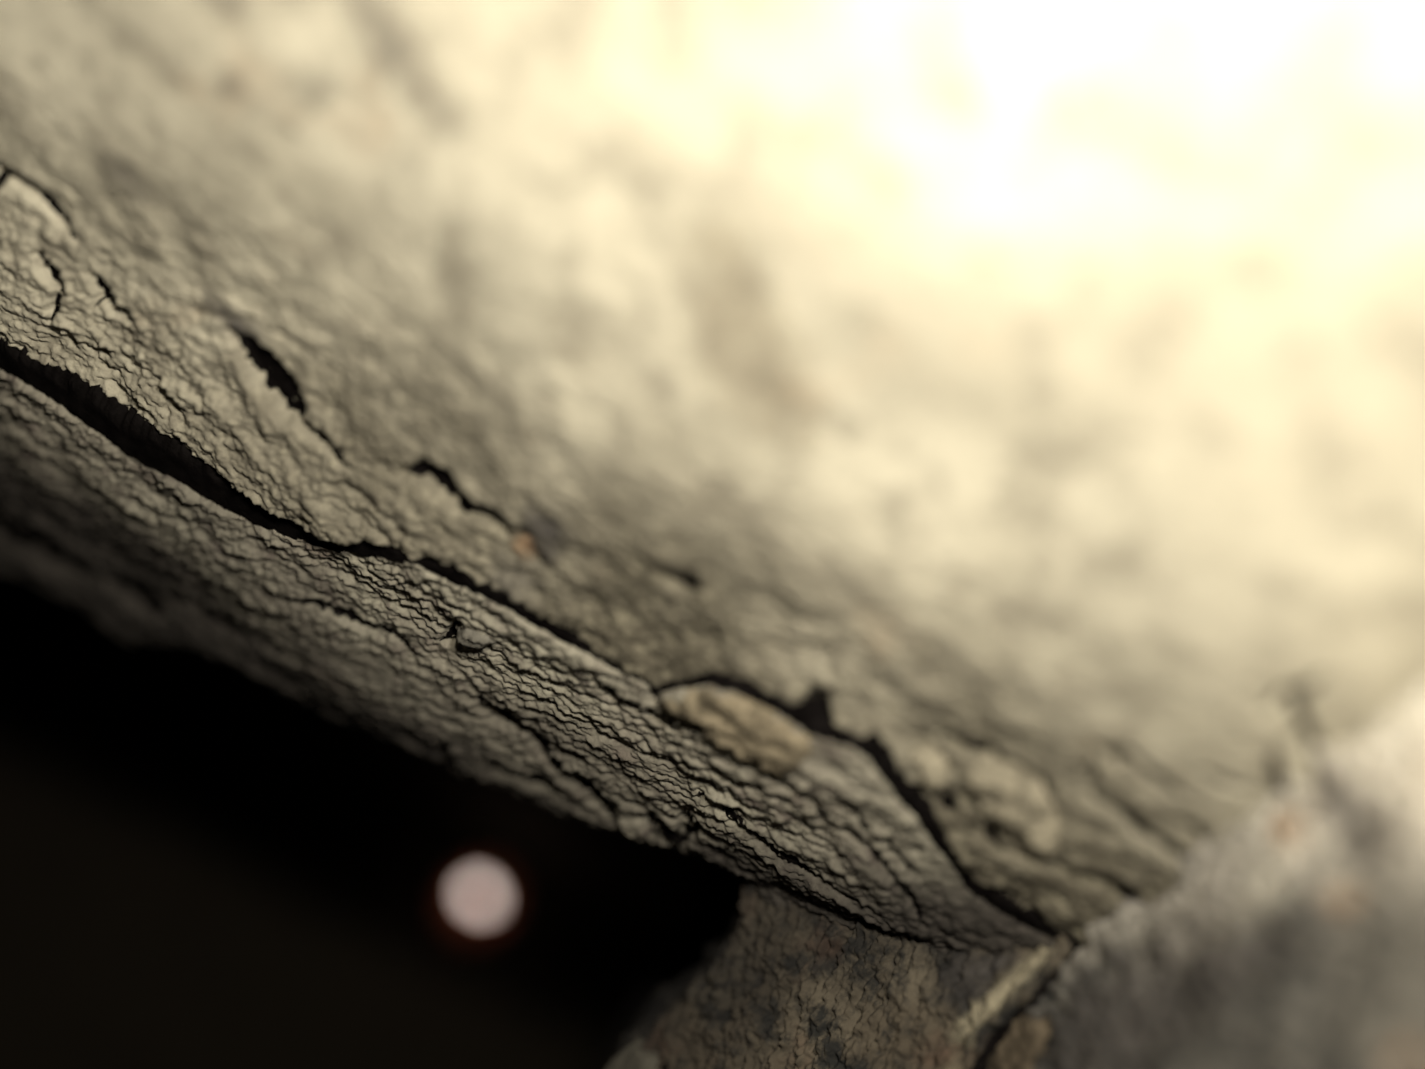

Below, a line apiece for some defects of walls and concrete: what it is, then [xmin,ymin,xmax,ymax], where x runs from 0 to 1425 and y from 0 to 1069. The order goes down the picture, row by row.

crack [0,161,136,325]
crack [0,329,1085,1069]